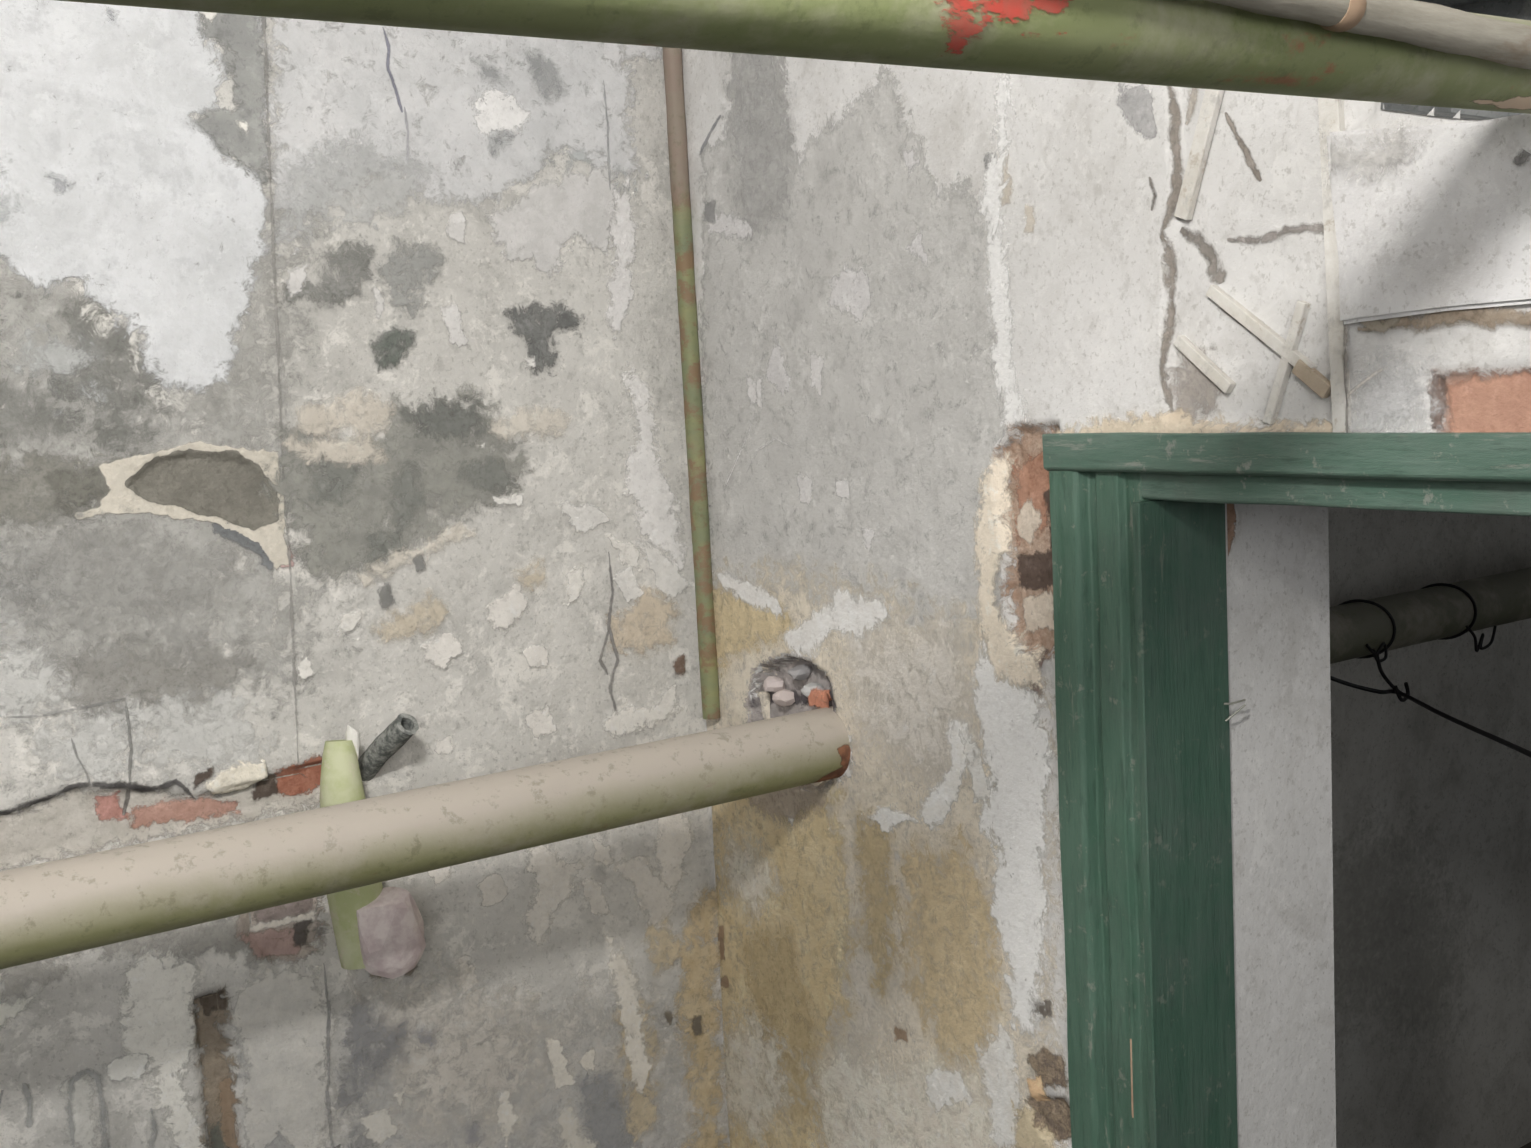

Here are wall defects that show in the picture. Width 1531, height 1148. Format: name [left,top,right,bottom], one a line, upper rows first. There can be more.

spalling [1415,0,1531,21]
spalling [1380,96,1531,120]
crack [1343,307,1531,433]
spalling [1426,368,1531,433]
spalling [74,441,294,570]
damp [0,178,569,790]
peeling [560,362,690,607]
peeling [421,632,462,669]
peeling [700,53,1071,1148]
crack [0,698,195,816]
damp [706,555,1066,1148]
peeling [230,897,340,1148]